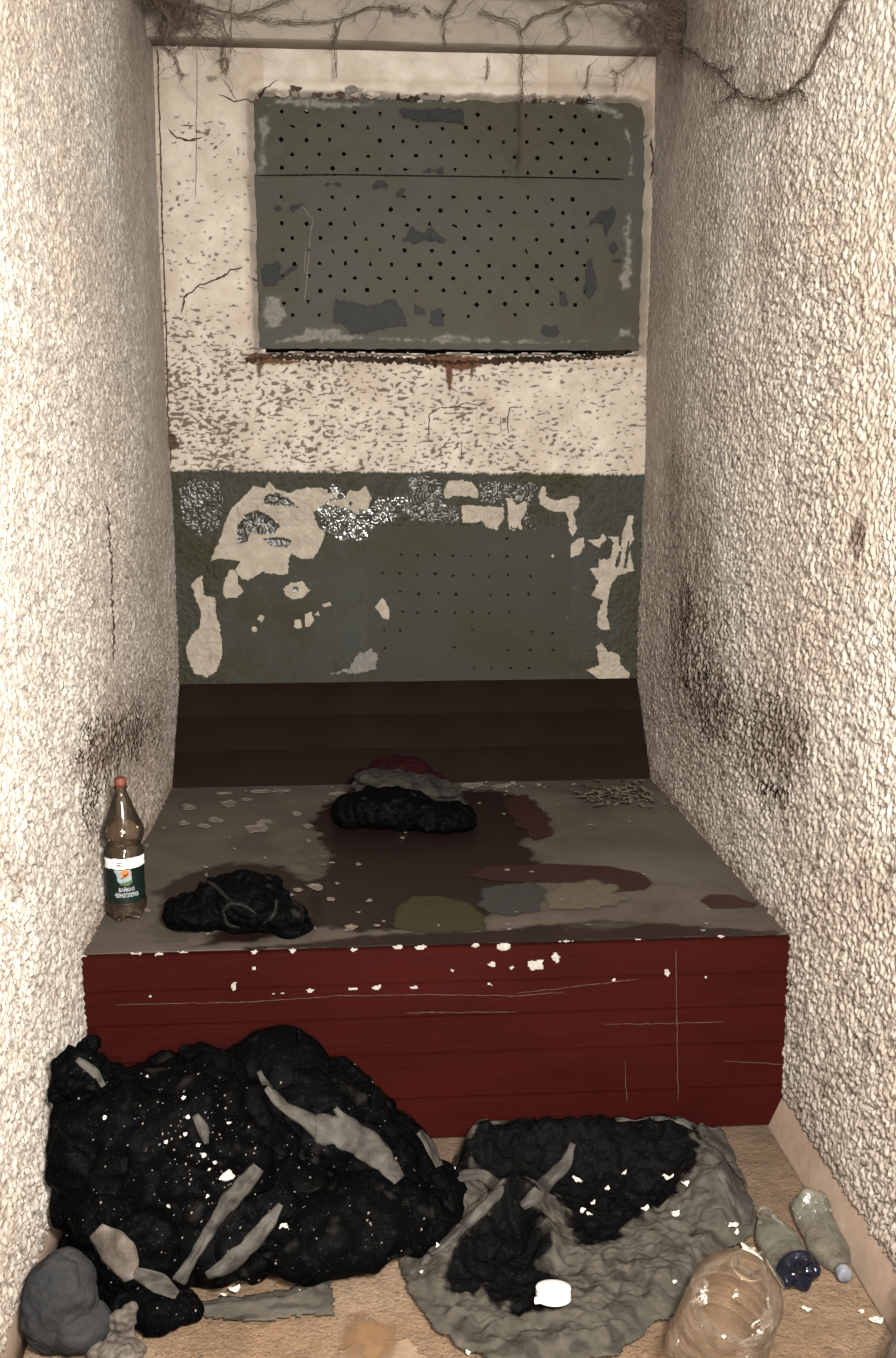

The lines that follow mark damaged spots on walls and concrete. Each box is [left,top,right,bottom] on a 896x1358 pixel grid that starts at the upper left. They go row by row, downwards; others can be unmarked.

corrosion [244,353,298,376]
corrosion [419,355,486,390]
peeling [186,482,378,678]
peeling [444,480,634,679]
peeling [375,598,389,620]